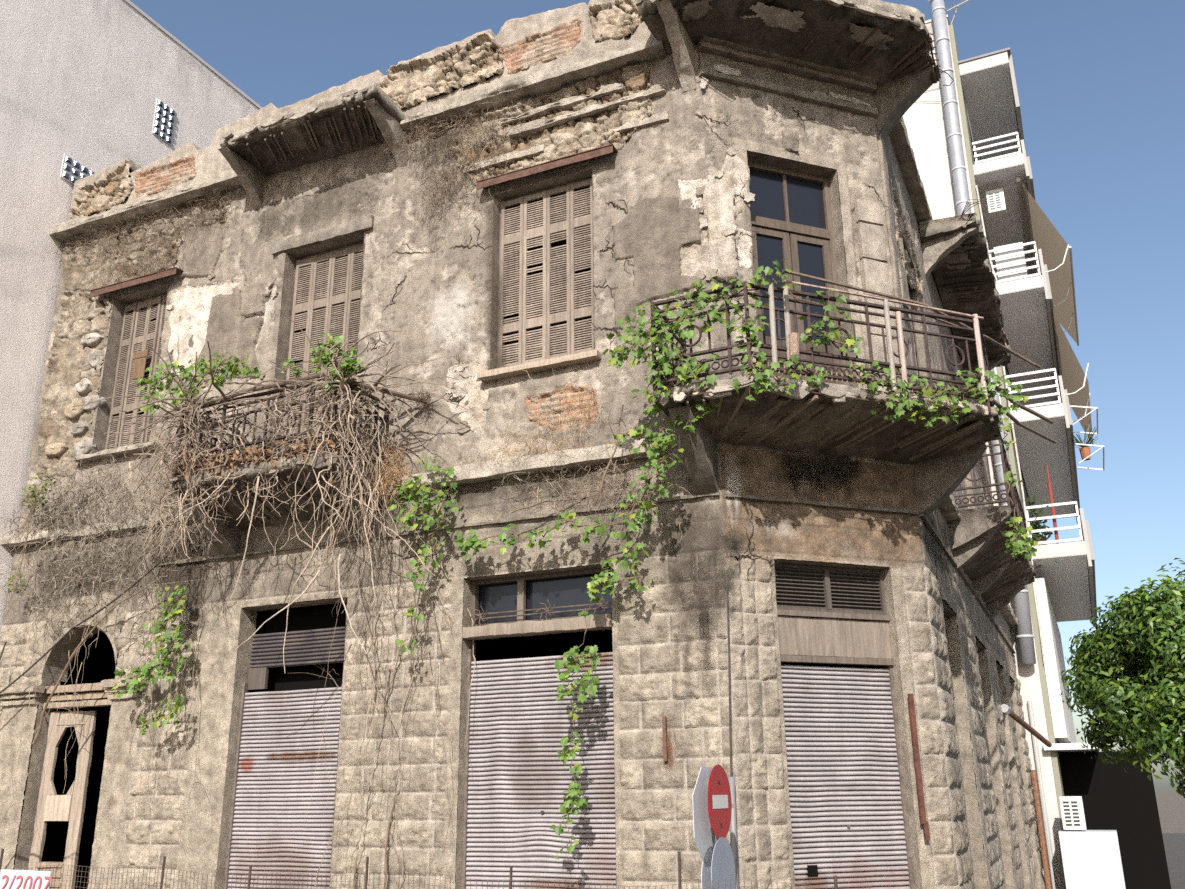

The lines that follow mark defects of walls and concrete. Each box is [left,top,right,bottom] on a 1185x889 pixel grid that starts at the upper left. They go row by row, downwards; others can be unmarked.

spalling [221,0,659,146]
peeling [682,0,713,22]
peeling [700,64,742,89]
peeling [740,2,806,33]
peeling [824,0,954,86]
spalling [450,61,653,186]
spalling [68,155,197,219]
peeling [612,147,755,329]
spalling [36,193,279,478]
spalling [525,382,598,432]
leakage [785,455,858,487]
crack [728,506,778,584]